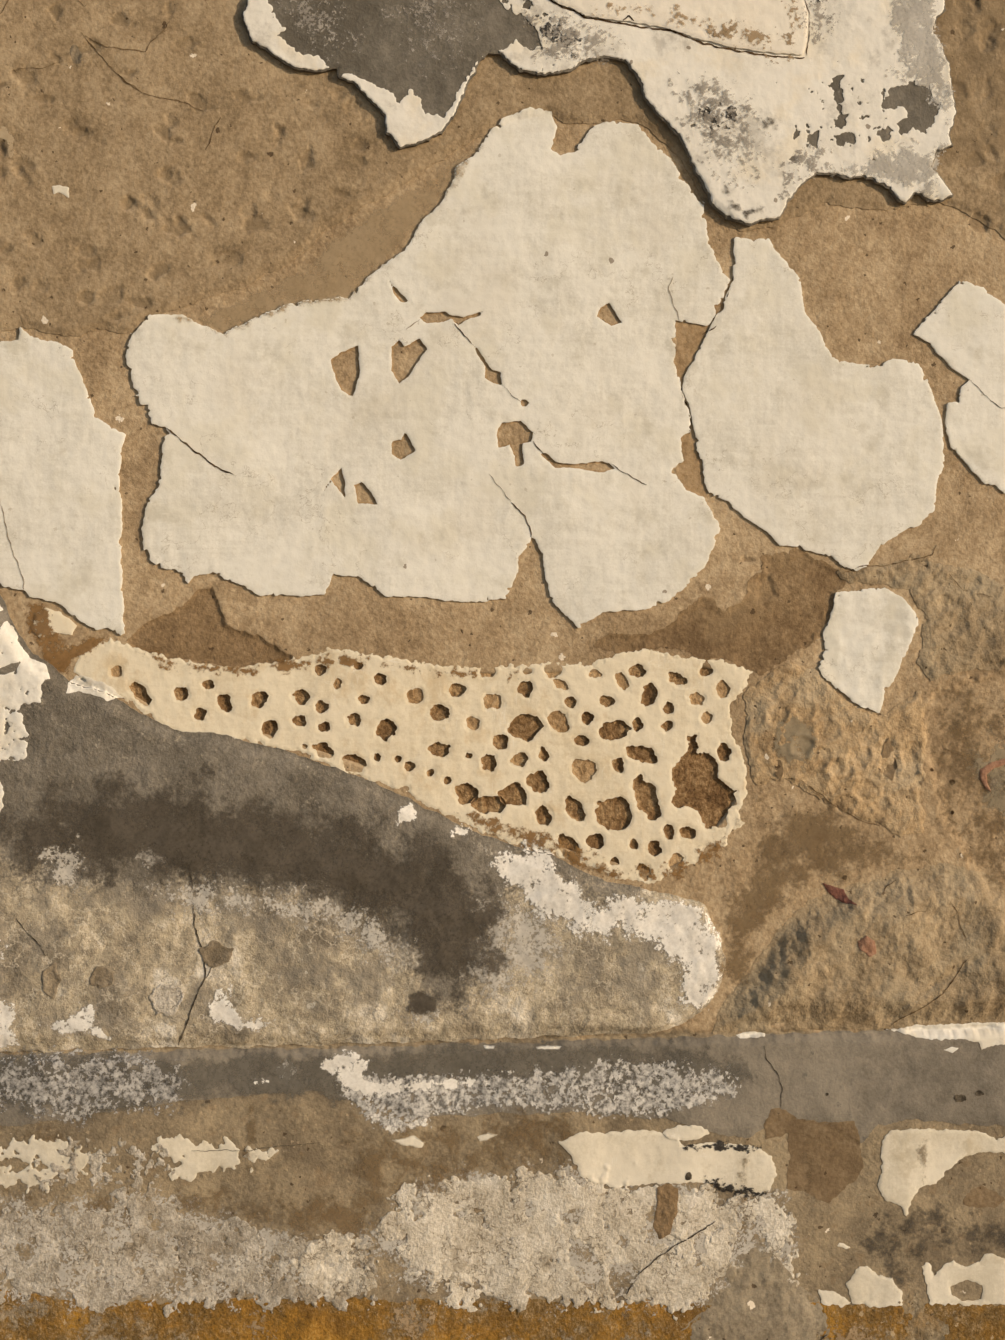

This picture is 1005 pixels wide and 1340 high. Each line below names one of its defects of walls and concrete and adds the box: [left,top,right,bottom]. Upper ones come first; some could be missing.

peeling [243,0,483,147]
peeling [498,0,956,224]
spalling [675,433,706,498]
peeling [0,606,50,761]
peeling [590,547,1005,838]
crack [178,870,221,1045]
damp [0,766,909,1033]
damp [0,1000,762,1320]
peeling [0,1108,864,1340]
damp [621,1175,800,1307]
peeling [818,1253,1005,1340]
peeling [877,1128,1005,1216]